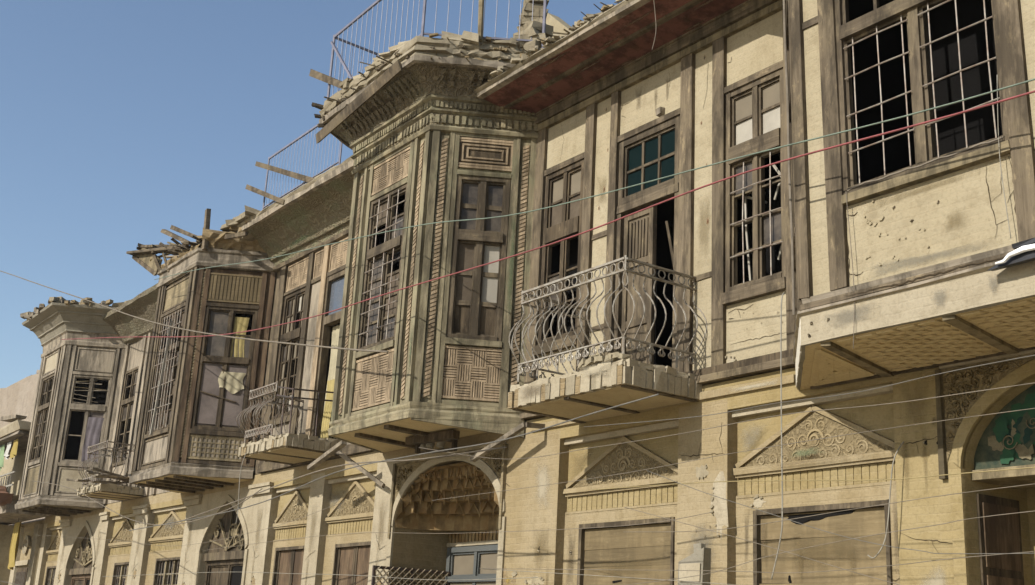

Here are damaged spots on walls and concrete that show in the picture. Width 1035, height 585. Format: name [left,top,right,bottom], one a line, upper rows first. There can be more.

flaking render [863,197,926,241]
crack [843,156,1016,296]
spalling [696,464,728,539]